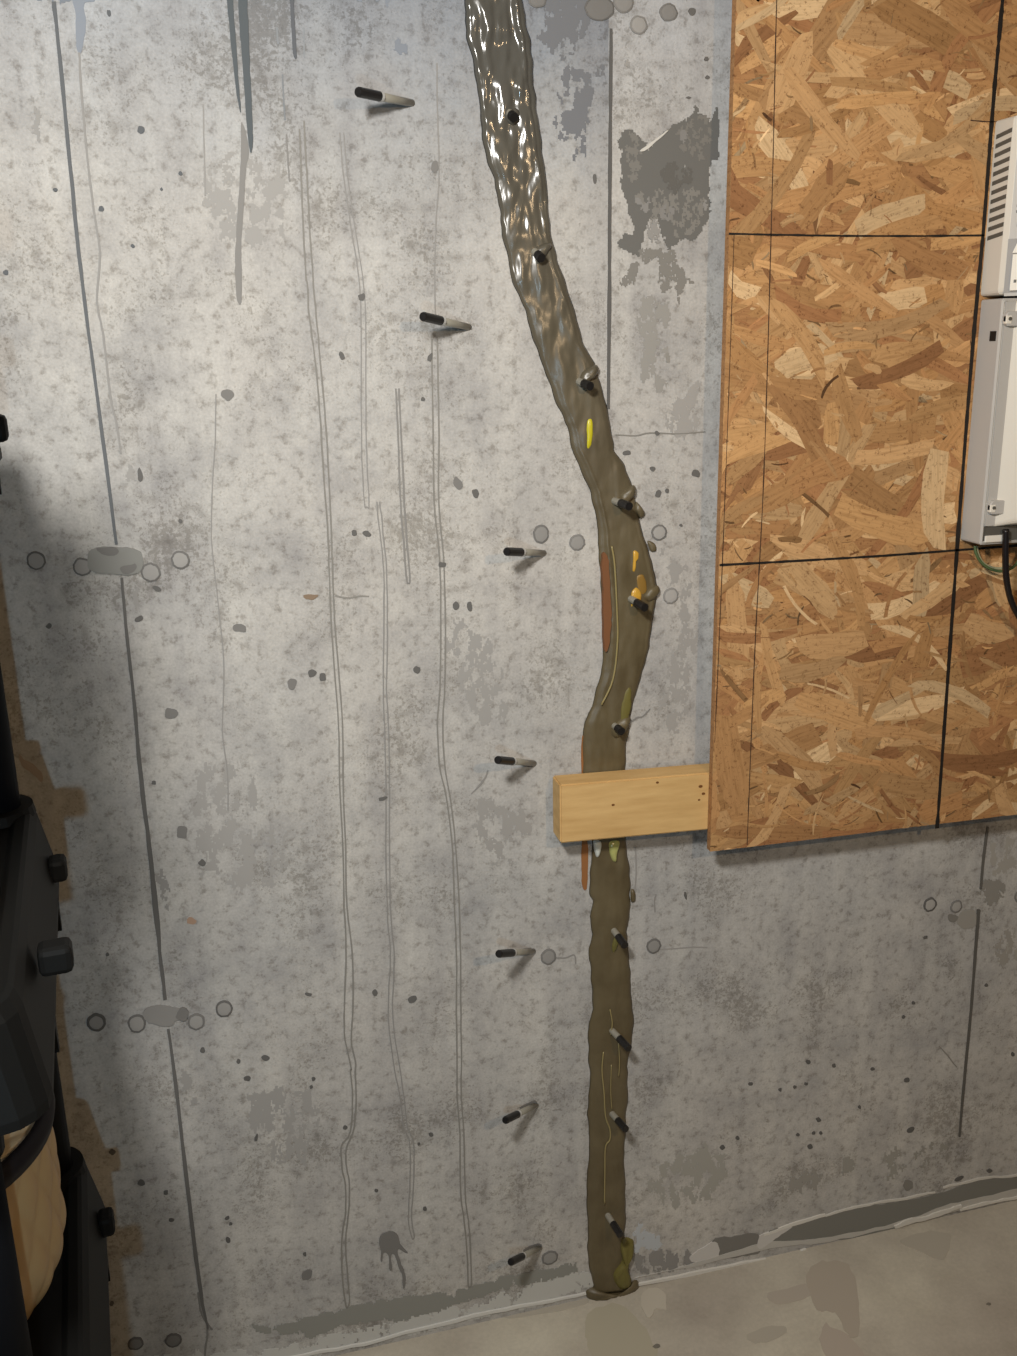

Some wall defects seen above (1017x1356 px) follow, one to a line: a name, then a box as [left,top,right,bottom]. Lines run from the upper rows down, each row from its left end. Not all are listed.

leakage [37,0,95,54]
leakage [617,105,720,440]
leakage [189,74,658,1356]
crack [471,770,489,794]
peeling [632,1189,1017,1278]